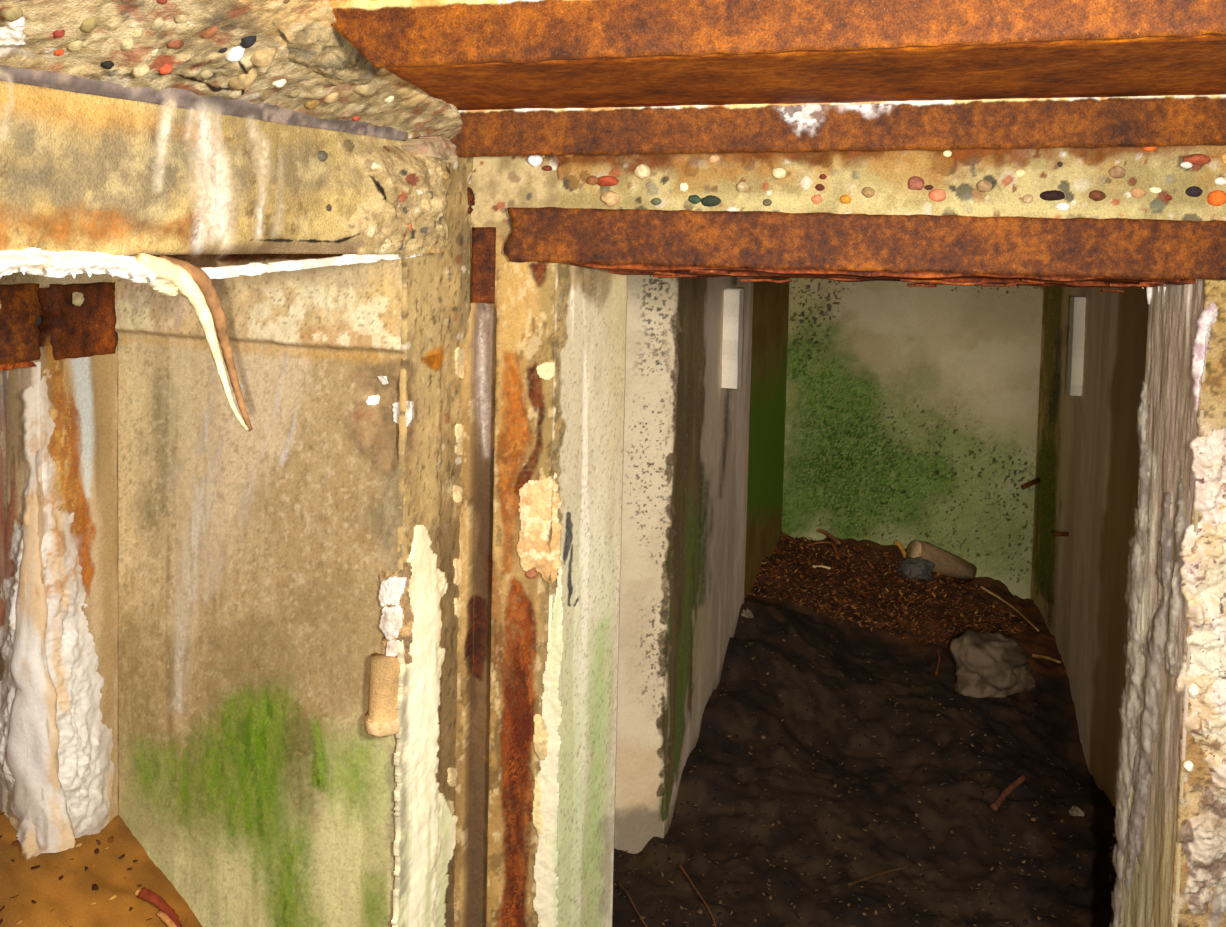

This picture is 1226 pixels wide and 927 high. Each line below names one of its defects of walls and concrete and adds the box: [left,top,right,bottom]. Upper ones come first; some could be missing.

water stain [0,17,30,56]
water stain [159,101,175,161]
water stain [187,111,234,244]
rust [530,263,546,285]
rust [653,269,792,283]
water stain [0,247,424,432]
flaking render [455,347,465,378]
rust [46,342,95,593]
flaking render [452,485,463,503]
flaking render [455,423,464,455]
rust [498,354,544,927]
flaking render [391,524,462,927]